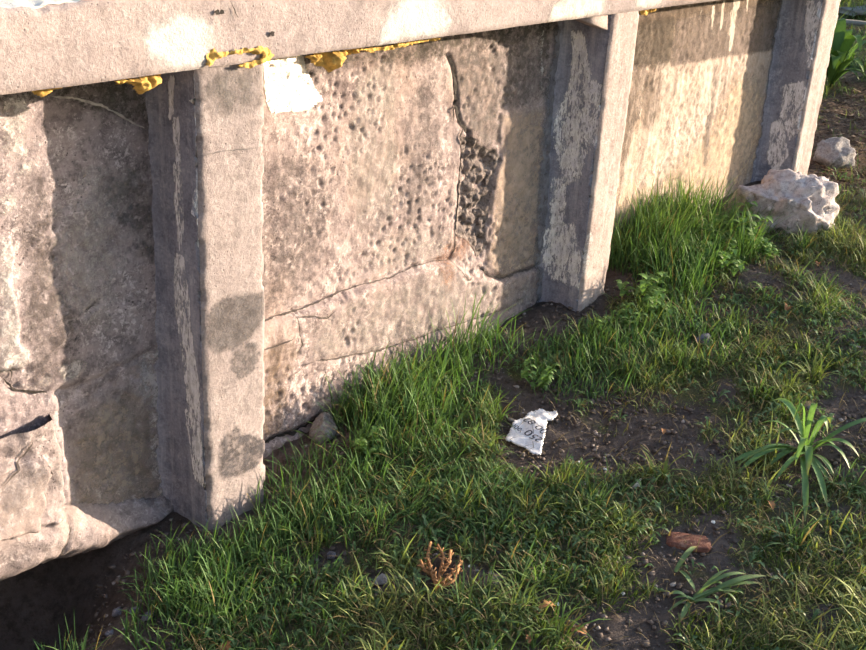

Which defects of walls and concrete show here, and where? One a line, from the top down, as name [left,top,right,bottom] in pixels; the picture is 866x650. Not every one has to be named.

water stain [804,0,822,68]
crack [446,55,466,145]
water stain [342,0,613,288]
water stain [619,0,782,195]
water stain [767,81,807,173]
flaking render [455,108,544,273]
crack [265,234,535,375]
crack [4,369,47,394]
crack [5,442,33,485]